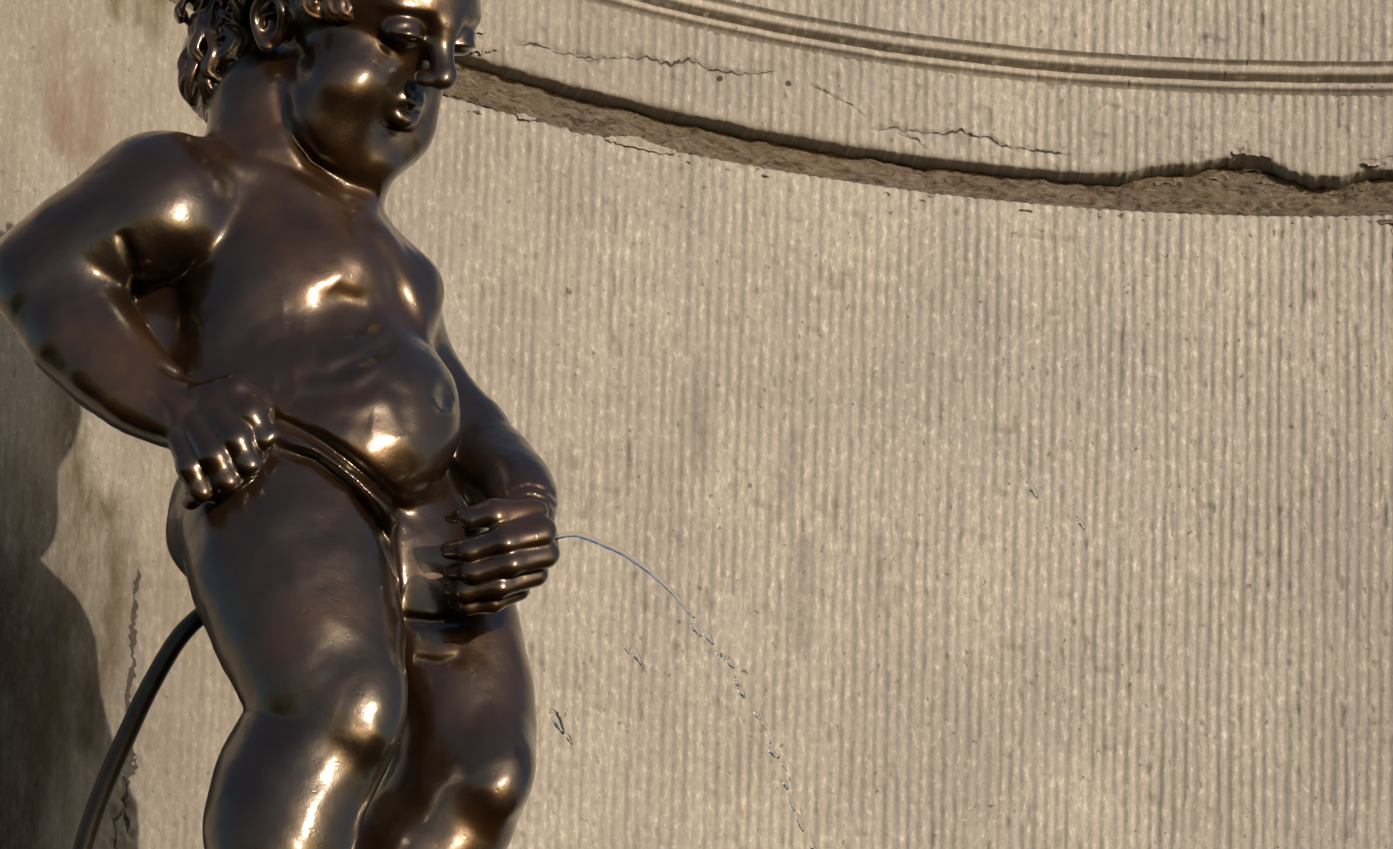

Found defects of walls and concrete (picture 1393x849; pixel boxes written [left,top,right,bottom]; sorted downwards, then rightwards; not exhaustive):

crack [521,42,774,75]
crack [811,85,1066,155]
spalling [606,135,676,154]
spalling [1141,144,1278,188]
spalling [1328,160,1393,195]
damp [80,546,122,747]